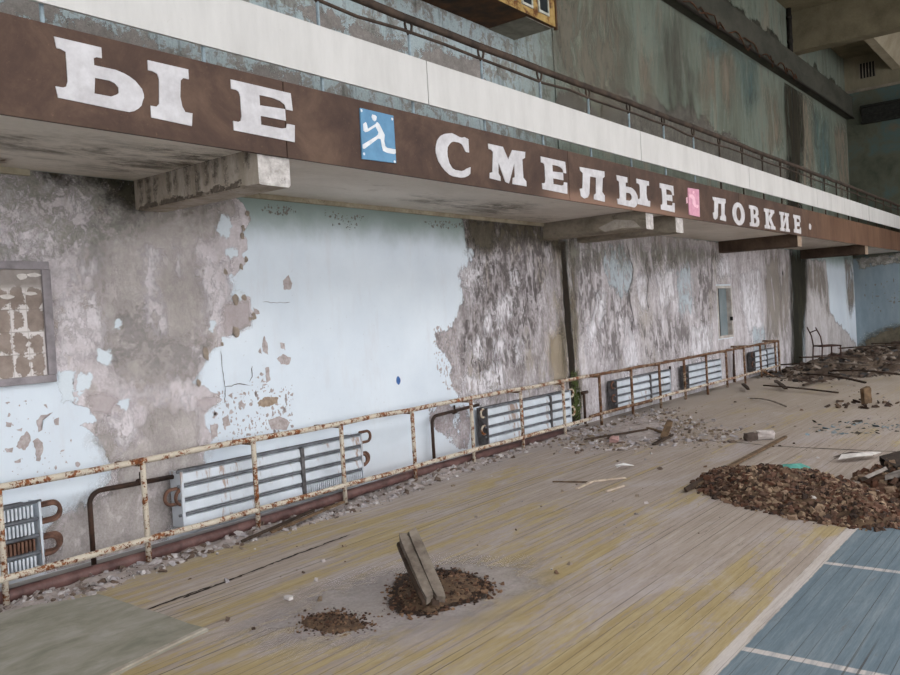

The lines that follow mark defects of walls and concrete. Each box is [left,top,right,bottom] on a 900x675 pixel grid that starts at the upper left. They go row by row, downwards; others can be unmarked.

water stain [554,0,624,113]
water stain [767,83,813,185]
peeling [0,171,294,573]
peeling [429,219,794,450]
peeling [805,259,856,361]